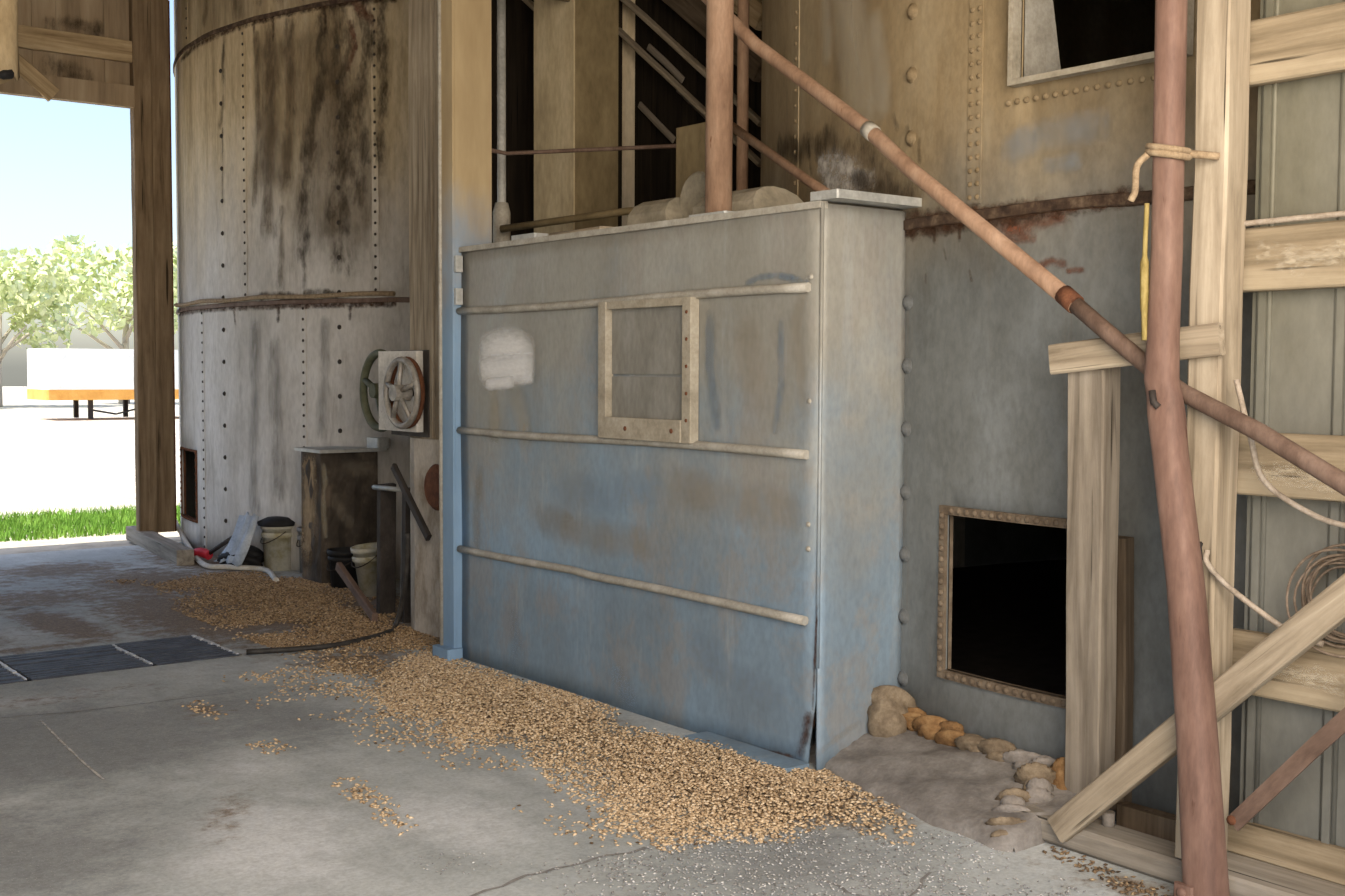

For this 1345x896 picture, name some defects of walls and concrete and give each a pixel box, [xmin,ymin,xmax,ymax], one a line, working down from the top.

damp [254,4,387,232]
corrosion [905,210,964,241]
corrosion [971,202,1078,241]
crack [470,847,649,896]